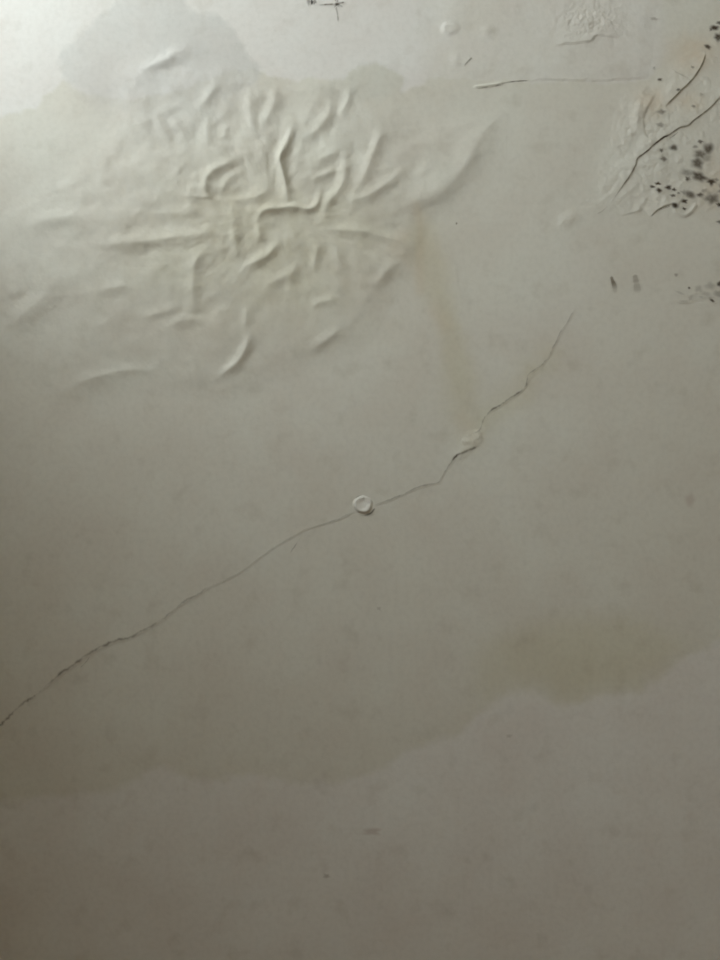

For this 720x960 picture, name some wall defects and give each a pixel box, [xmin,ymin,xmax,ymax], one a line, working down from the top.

crack [469,75,537,91]
crack [609,98,720,205]
water stain [648,139,720,211]
water stain [677,279,720,304]
crack [0,310,574,727]
water stain [462,602,700,717]